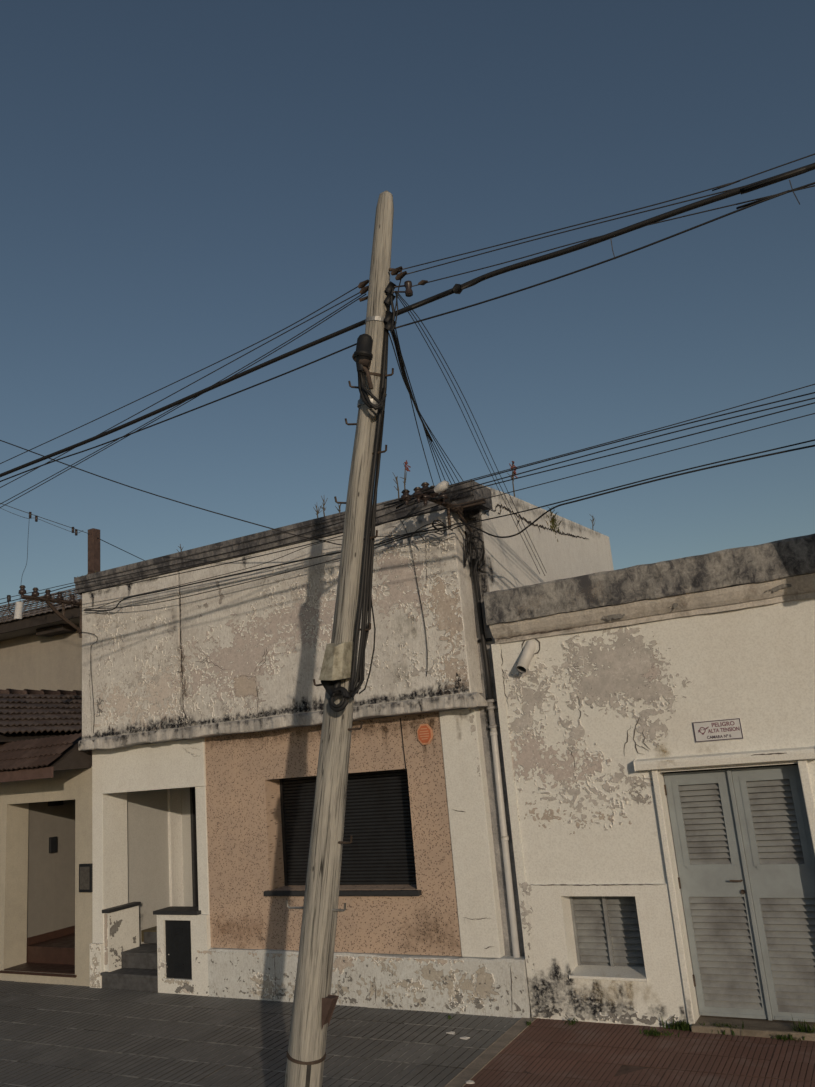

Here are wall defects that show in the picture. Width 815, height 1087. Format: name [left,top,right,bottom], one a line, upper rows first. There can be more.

peeling [83,561,340,734]
damp [79,697,324,746]
damp [354,673,474,728]
peeling [503,624,690,834]
peeling [331,955,680,1027]
damp [528,963,632,1018]